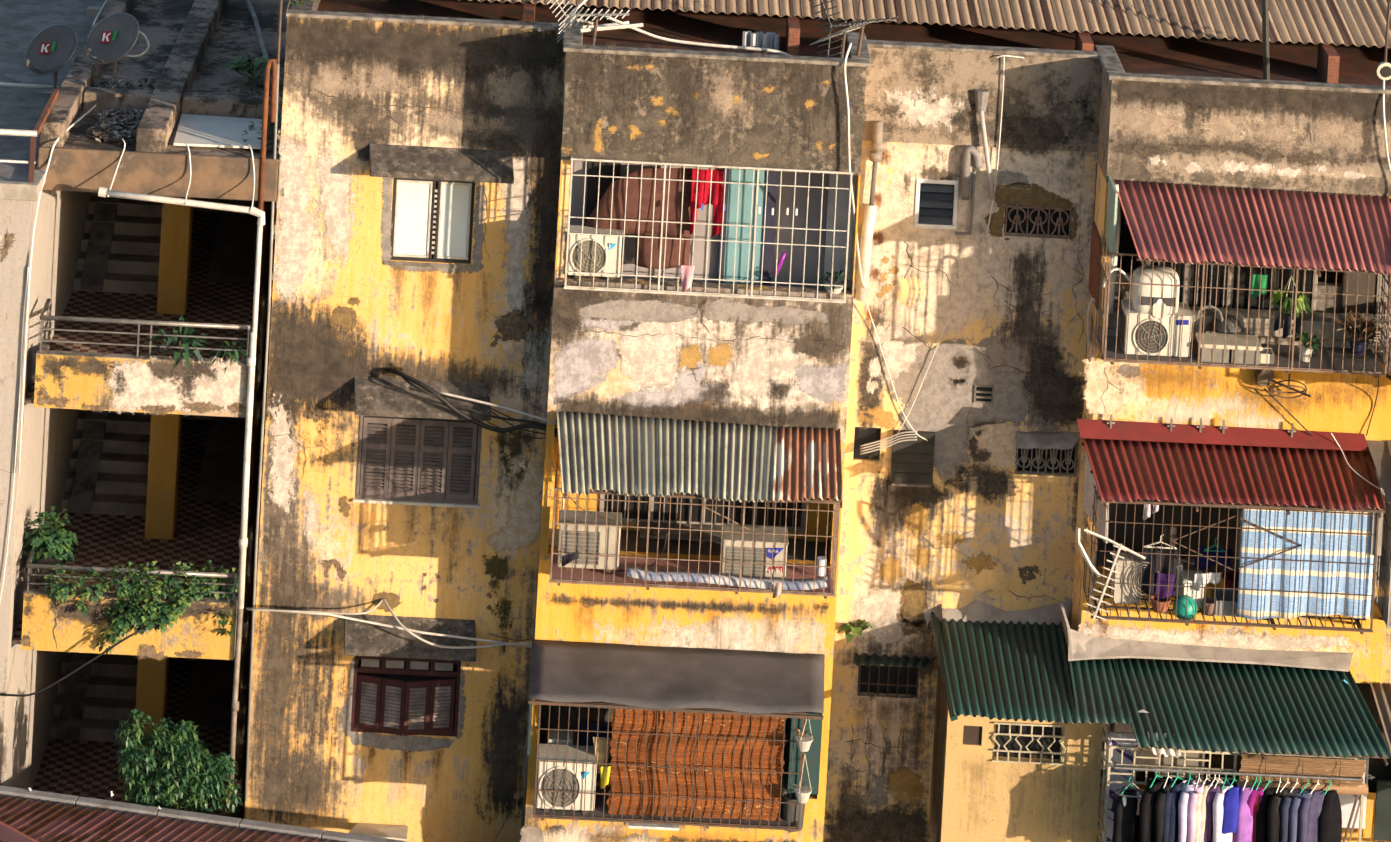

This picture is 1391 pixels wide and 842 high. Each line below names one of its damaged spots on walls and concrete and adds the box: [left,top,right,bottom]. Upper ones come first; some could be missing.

water stain [1114,75,1391,158]
peeling [35,356,247,416]
peeling [271,129,358,303]
water stain [258,12,857,492]
peeling [425,65,847,408]
water stain [857,342,885,431]
flaking render [857,321,925,431]
crack [902,240,1089,436]
peeling [264,393,347,581]
peeling [854,502,997,646]
water stain [238,526,366,826]
water stain [823,598,948,842]